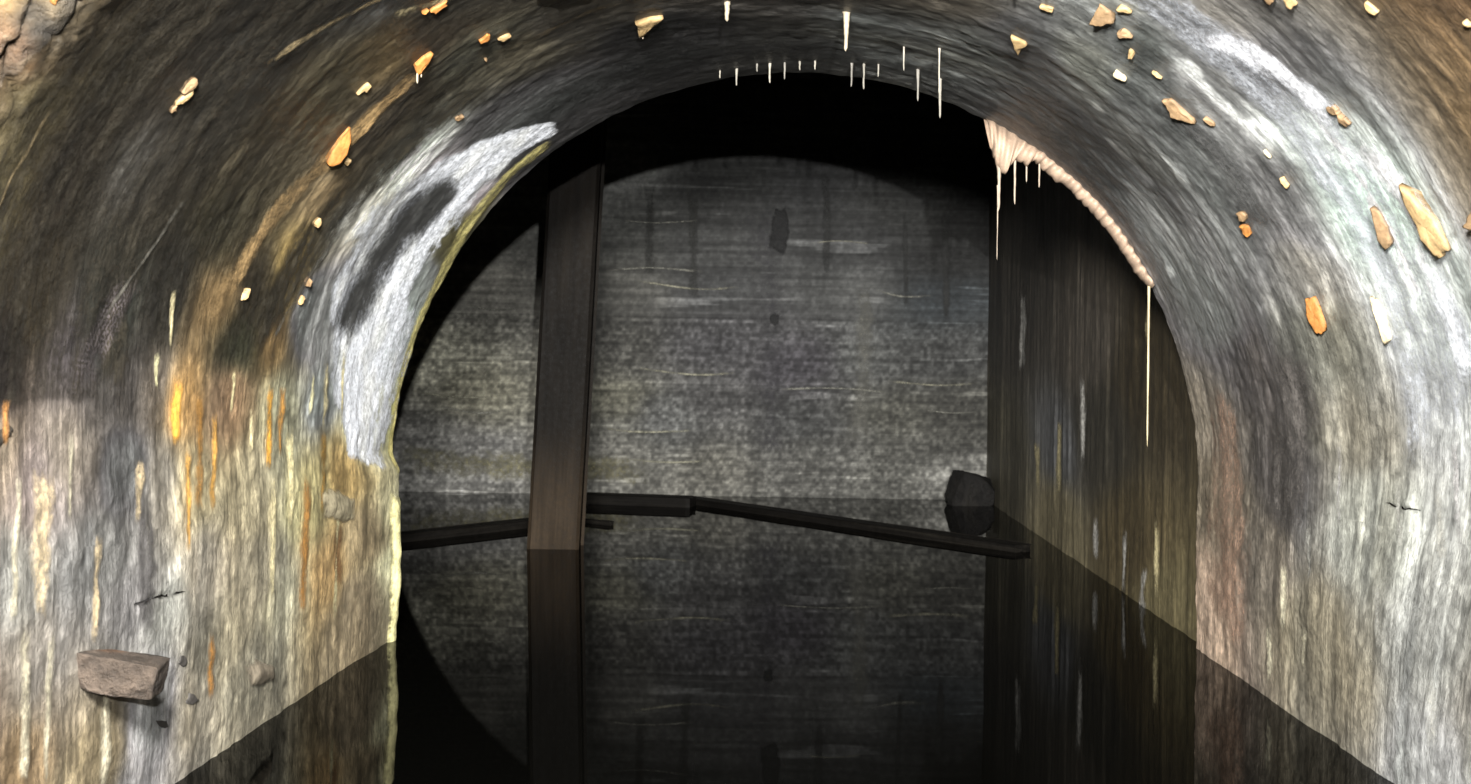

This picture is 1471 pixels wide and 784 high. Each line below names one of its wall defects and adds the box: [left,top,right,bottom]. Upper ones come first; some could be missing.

damp [278,0,380,58]
damp [984,118,1154,288]
damp [78,218,172,375]
damp [11,448,73,606]
damp [136,465,156,620]
rust [171,387,217,543]
rust [266,394,285,464]
damp [270,439,295,592]
rust [300,440,326,608]
damp [1122,531,1159,607]
damp [20,641,53,773]
damp [101,695,110,782]